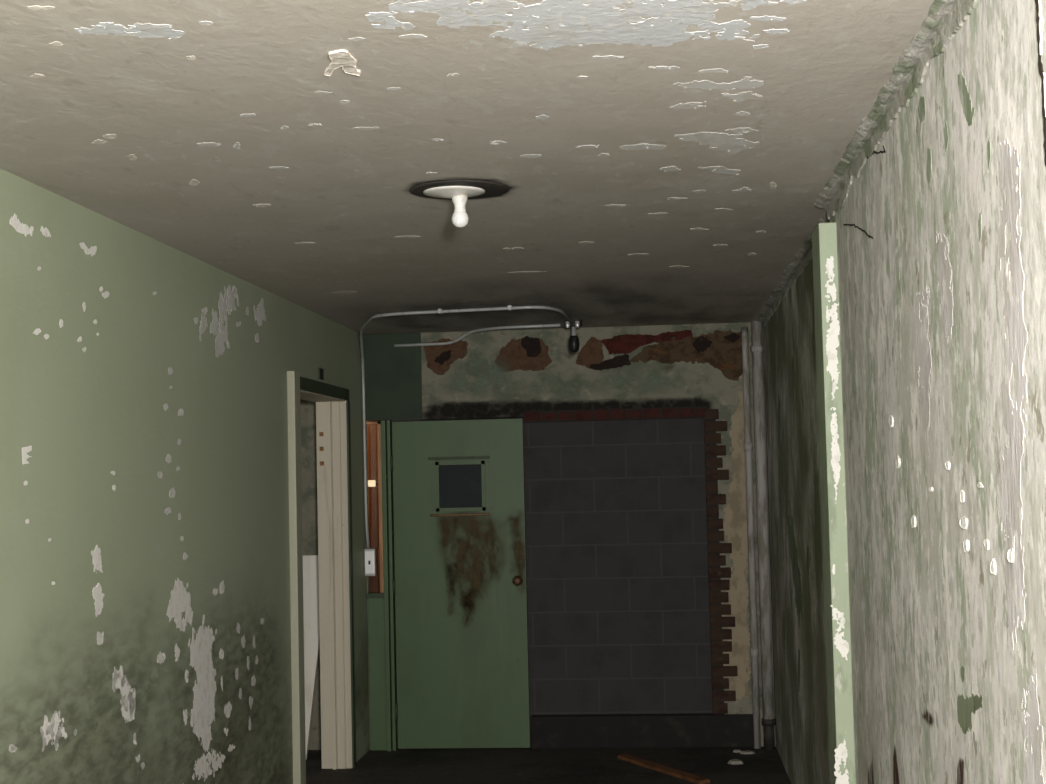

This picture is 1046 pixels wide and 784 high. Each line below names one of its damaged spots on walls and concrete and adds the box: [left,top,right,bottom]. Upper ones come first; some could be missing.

peeling [324,37,365,76]
peeling [365,0,806,59]
crack [1035,0,1046,166]
flaking render [424,338,468,375]
flaking render [495,336,552,372]
peeling [825,256,841,504]
peeling [91,545,104,617]
peeling [830,605,849,660]
peeling [157,579,258,784]
peeling [40,711,77,752]
peeling [113,666,145,769]
peeling [834,739,849,784]